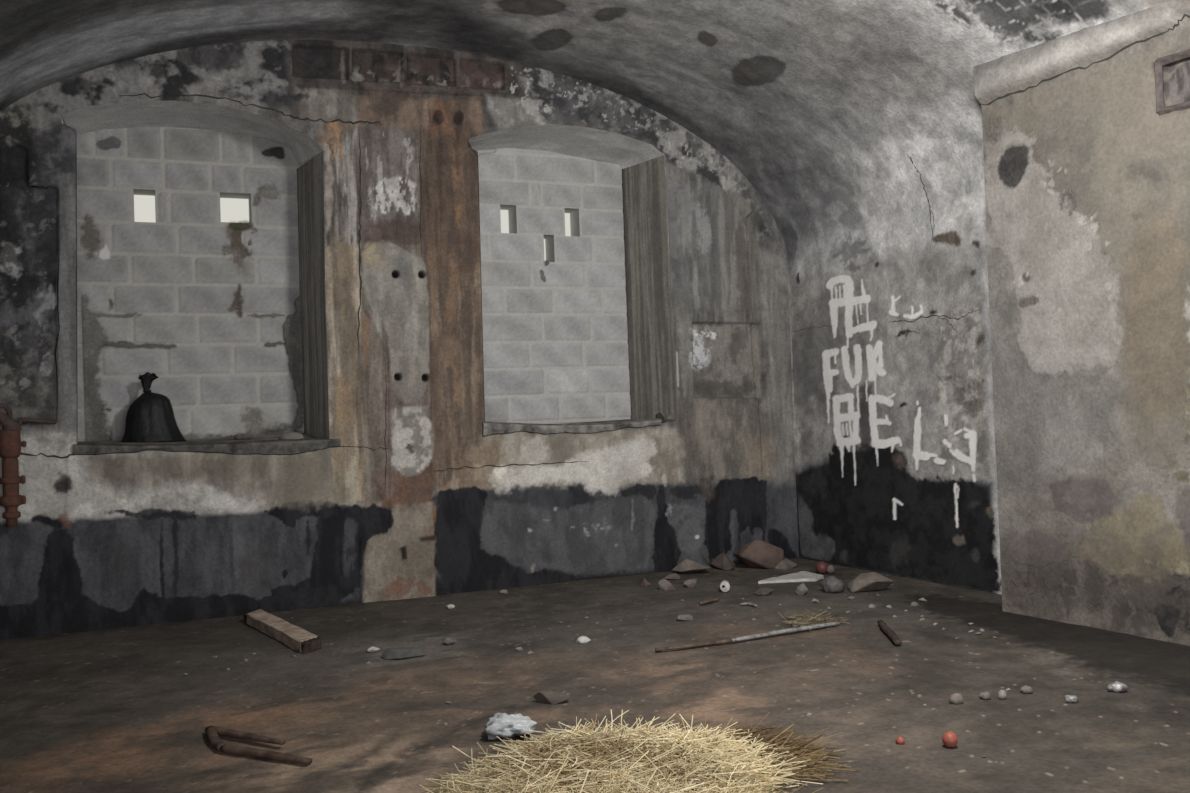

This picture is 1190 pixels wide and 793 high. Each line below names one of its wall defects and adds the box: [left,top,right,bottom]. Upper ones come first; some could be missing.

crack [976,14,1190,106]
crack [117,93,381,344]
crack [416,130,424,256]
peeling [1039,159,1077,218]
damp [982,41,1190,466]
corrosion [325,44,512,601]
crack [20,452,73,460]
damp [73,449,360,597]
crack [340,369,390,486]
peeling [478,431,719,579]
damp [1007,474,1190,582]
damp [886,592,1190,727]